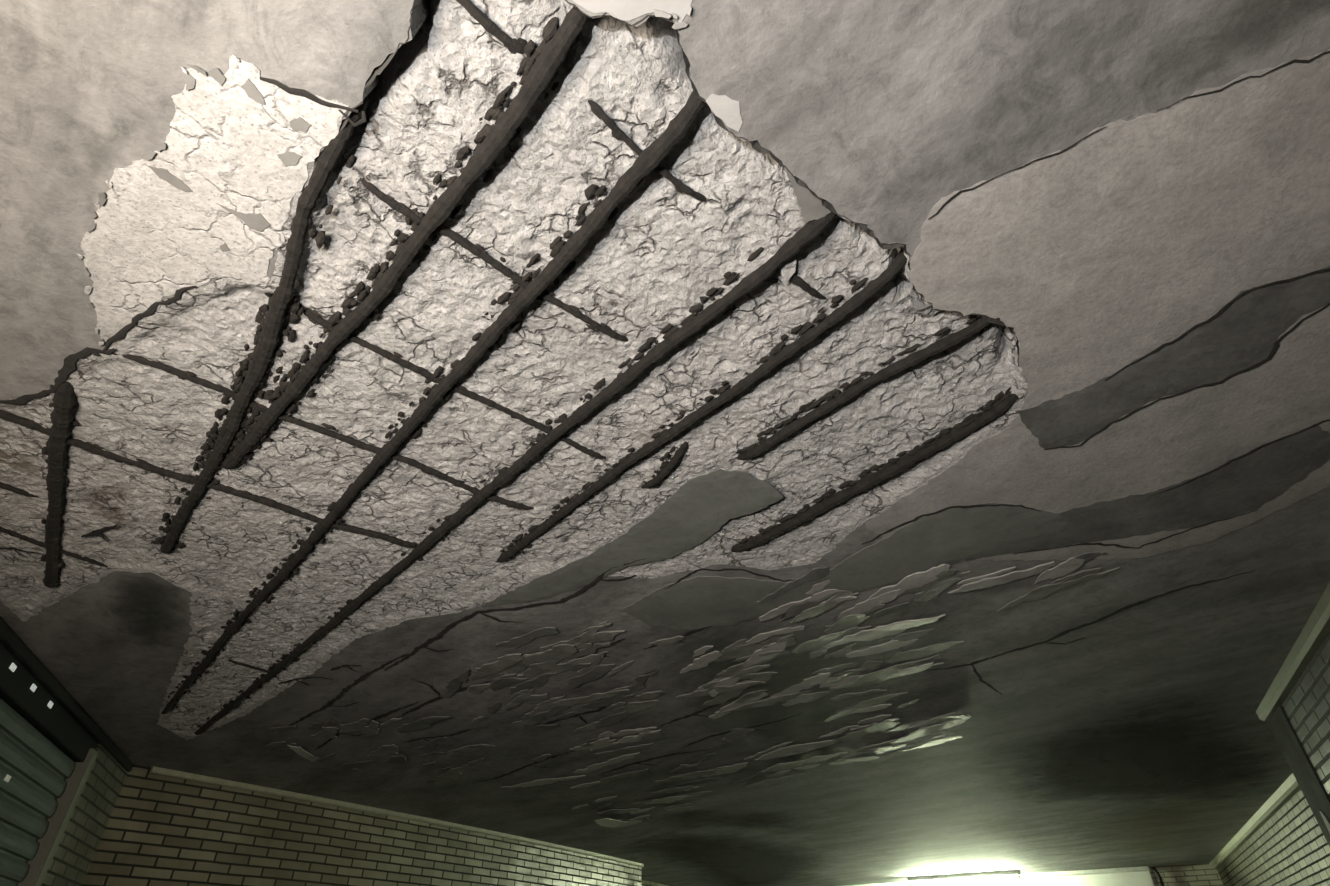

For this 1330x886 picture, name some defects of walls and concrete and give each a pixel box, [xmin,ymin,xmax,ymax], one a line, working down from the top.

peeling [908,49,1330,410]
spalling [0,0,1028,742]
peeling [866,305,1330,611]
flaking render [1016,266,1330,450]
crack [278,559,643,750]
crack [472,706,608,784]
crack [577,626,712,658]
crack [599,697,804,775]
crack [924,570,1255,695]